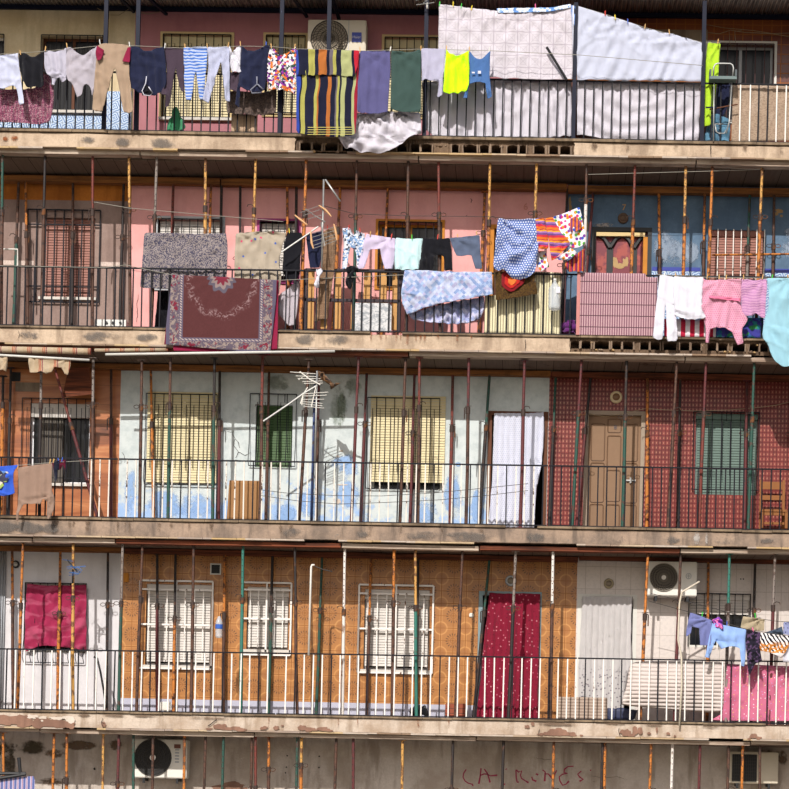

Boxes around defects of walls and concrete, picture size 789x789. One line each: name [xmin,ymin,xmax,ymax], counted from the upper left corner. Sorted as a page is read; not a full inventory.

peeling [0,714,75,729]